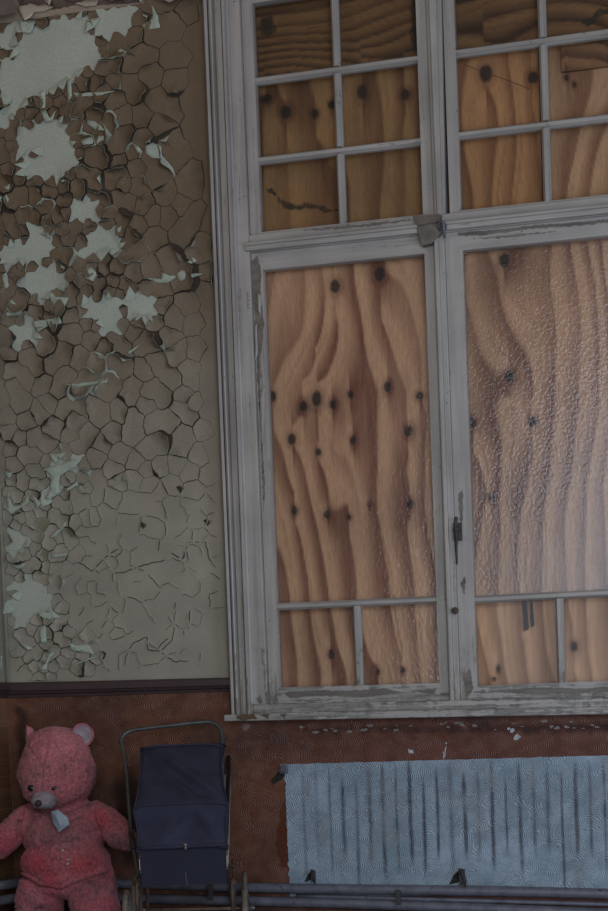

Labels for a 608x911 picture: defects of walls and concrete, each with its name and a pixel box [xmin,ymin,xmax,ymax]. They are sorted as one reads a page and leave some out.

peeling [0,0,214,681]
crack [53,462,226,674]